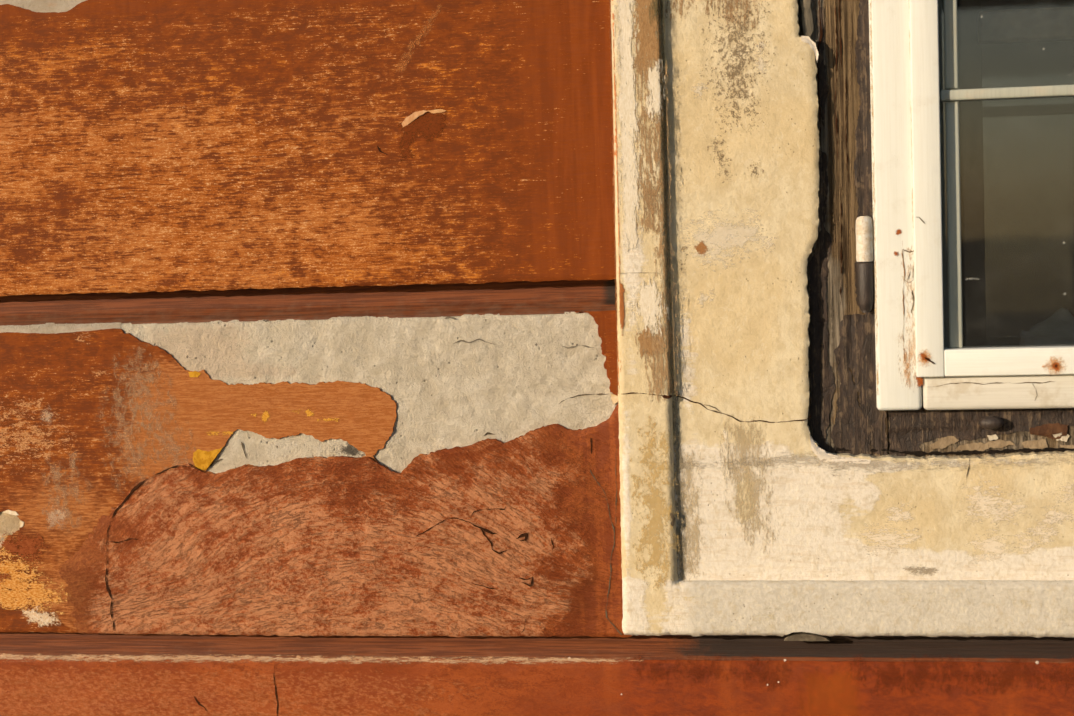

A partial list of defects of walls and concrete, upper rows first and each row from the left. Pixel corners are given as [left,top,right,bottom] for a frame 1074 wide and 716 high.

peeling [0,0,86,13]
peeling [377,108,447,161]
peeling [801,0,828,130]
peeling [854,0,873,221]
peeling [631,0,777,402]
peeling [808,149,1074,464]
spalling [0,312,618,478]
crack [625,392,811,423]
peeling [0,510,78,632]
crack [105,465,202,630]
crack [417,507,554,554]